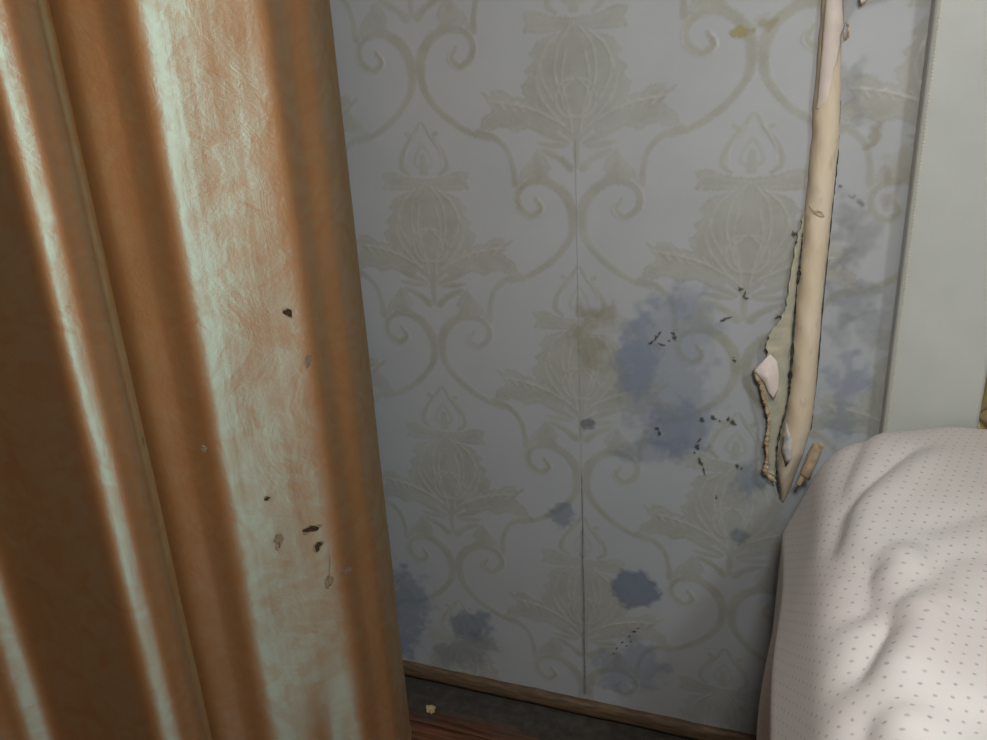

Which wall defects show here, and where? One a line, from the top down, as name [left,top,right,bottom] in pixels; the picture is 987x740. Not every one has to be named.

peeling [754,354,779,399]
water stain [613,571,659,608]